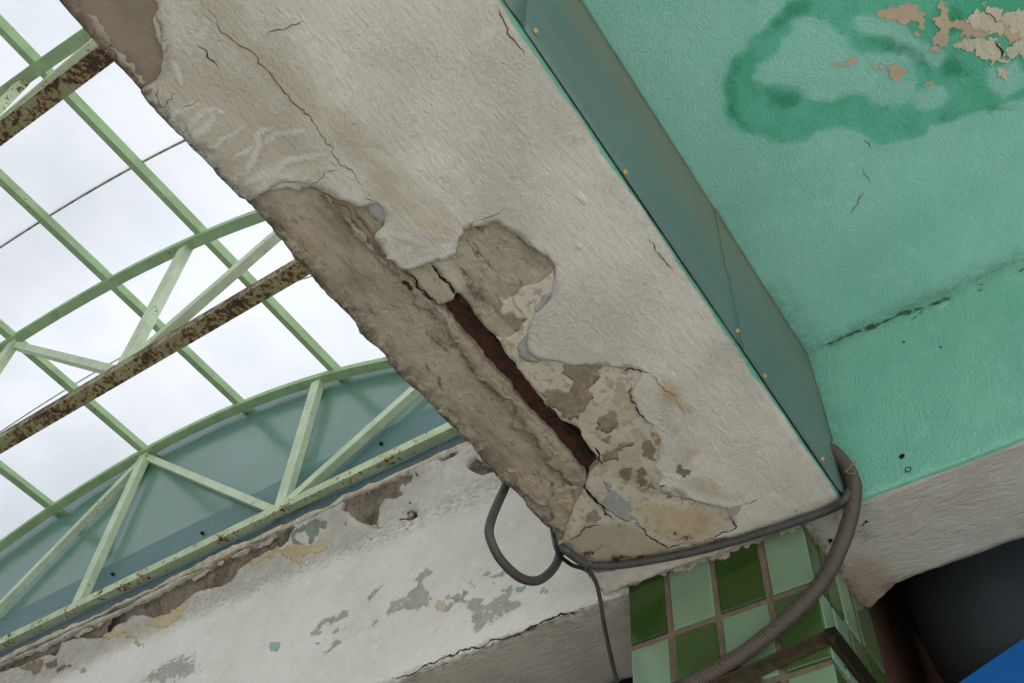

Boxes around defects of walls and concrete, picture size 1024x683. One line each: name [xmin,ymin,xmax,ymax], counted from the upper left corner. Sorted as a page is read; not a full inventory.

spalling [59,0,164,90]
crack [198,12,374,202]
water stain [717,0,1024,151]
peeling [871,62,907,83]
peeling [875,0,1024,79]
spalling [246,182,742,590]
crack [569,484,682,549]
spalling [0,518,329,675]
peeling [143,652,205,683]
peeling [309,610,348,653]
peeling [361,567,526,633]